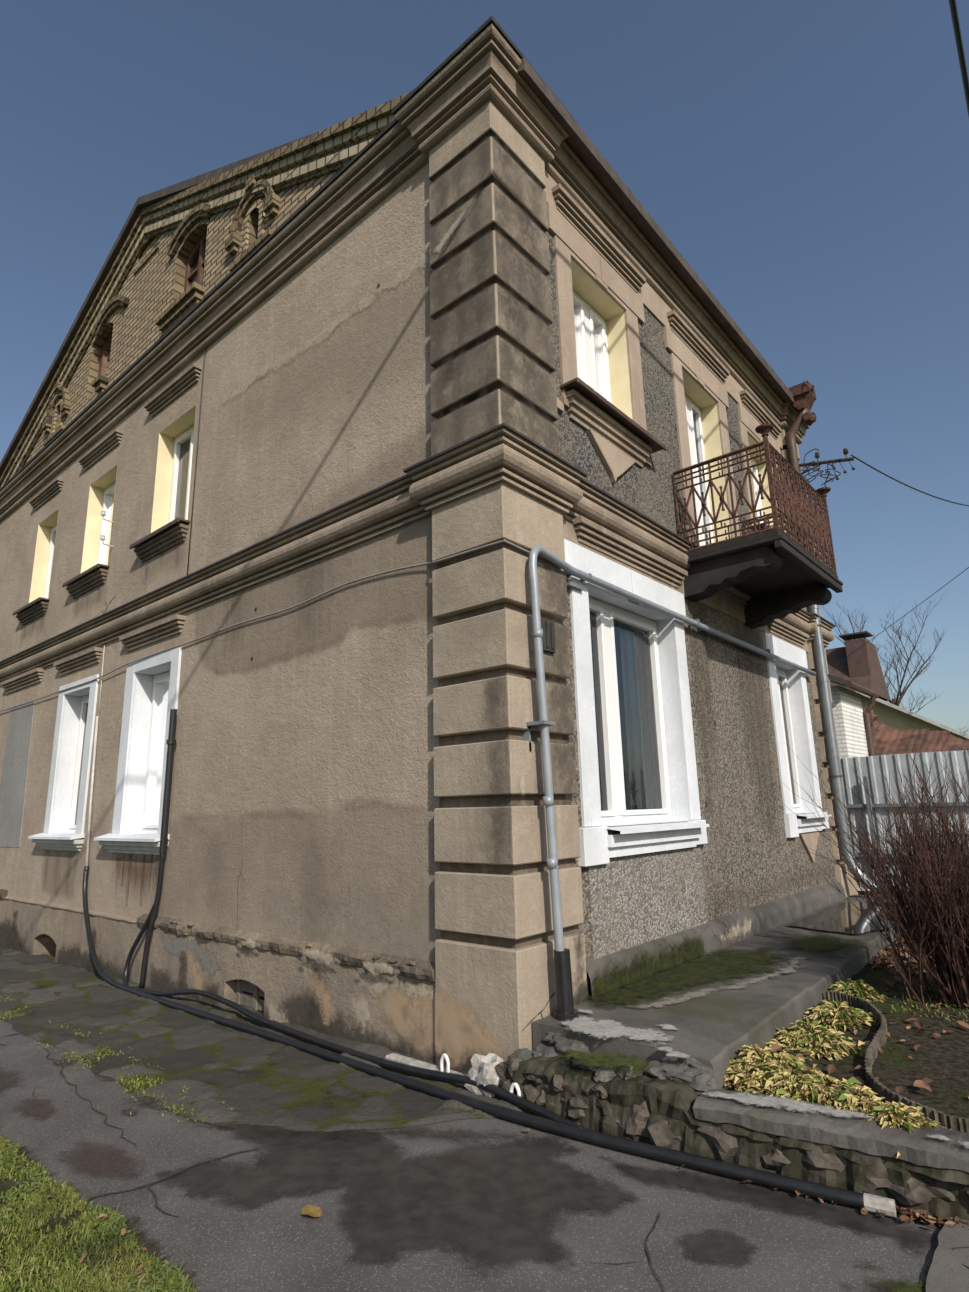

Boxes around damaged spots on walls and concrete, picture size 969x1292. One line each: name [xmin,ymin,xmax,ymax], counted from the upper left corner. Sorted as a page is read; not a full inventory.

spalling [301,950,340,964]
peeling [267,998,288,1023]
peeling [310,978,335,1024]
peeling [351,962,505,1065]
crack [86,1147,259,1217]
leakage [157,1122,933,1267]
crack [590,1211,665,1292]